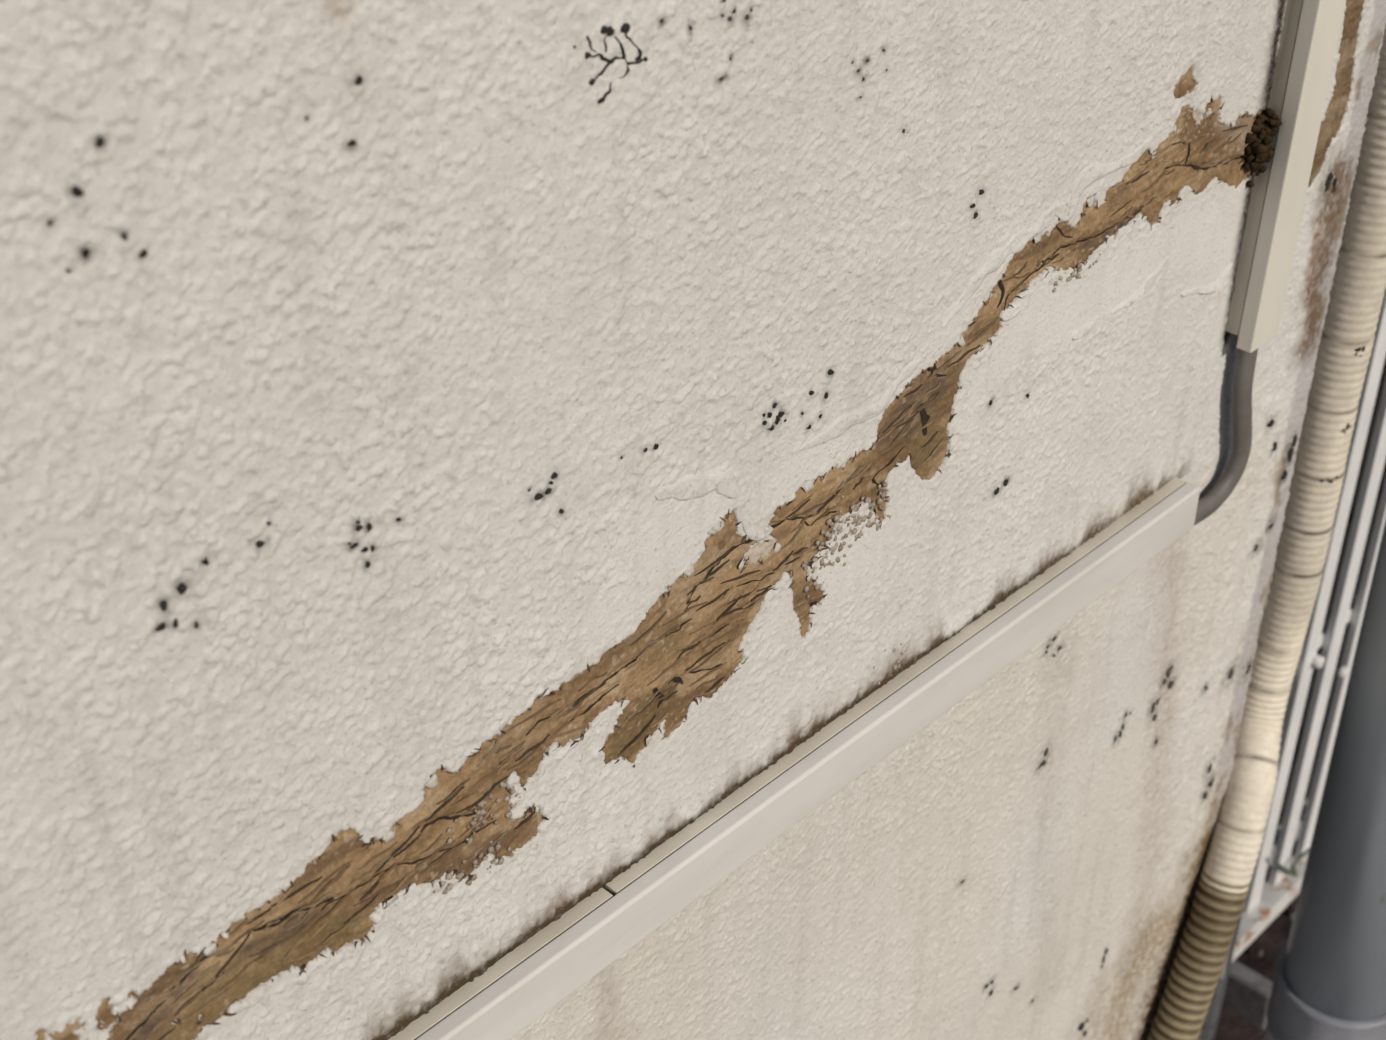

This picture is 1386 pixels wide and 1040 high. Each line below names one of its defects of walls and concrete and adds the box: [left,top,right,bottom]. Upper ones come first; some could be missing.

spalling [1308,0,1364,187]
spalling [95,67,1261,1040]
leakage [1150,666,1174,721]
peeling [35,1018,85,1040]